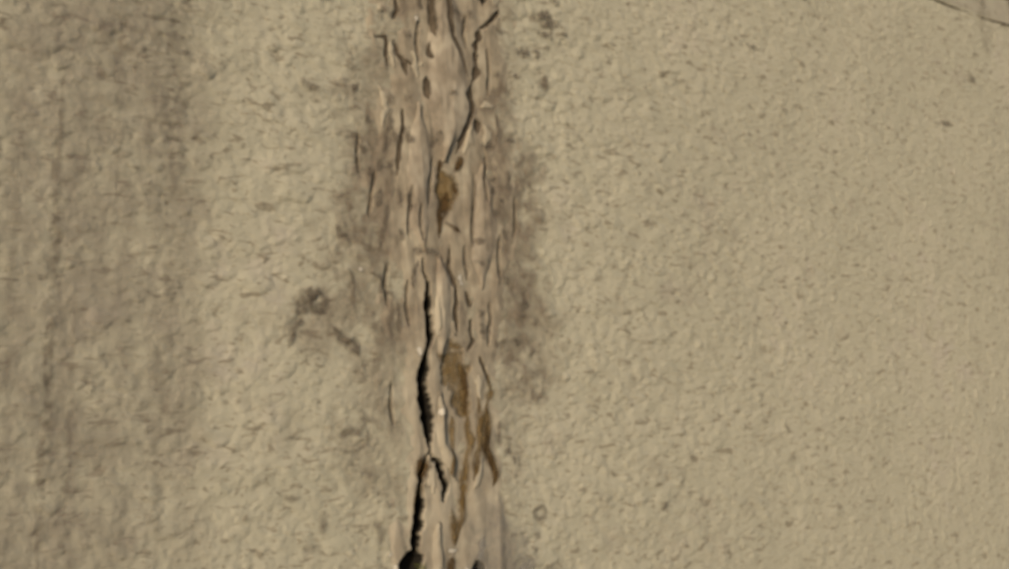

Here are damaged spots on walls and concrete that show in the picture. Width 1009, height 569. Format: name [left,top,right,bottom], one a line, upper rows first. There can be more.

crack [375,0,498,154]
crack [396,109,432,239]
crack [383,161,491,552]